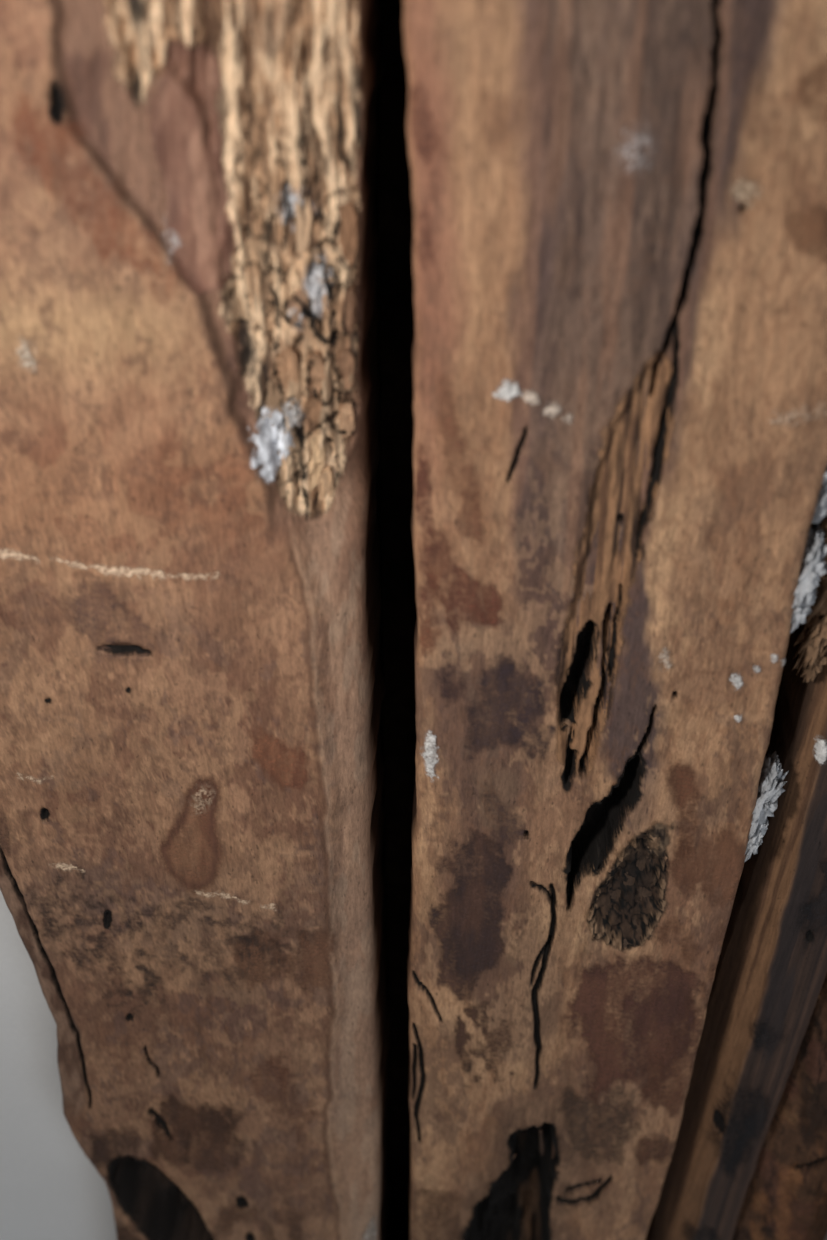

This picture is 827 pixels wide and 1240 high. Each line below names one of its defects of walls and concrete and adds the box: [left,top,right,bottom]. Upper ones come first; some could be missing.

crack [634,0,722,556]
leakage [468,658,555,759]
leakage [430,794,524,1081]
crack [531,883,556,1086]
leakage [561,925,715,1165]
leakage [116,1226,137,1240]